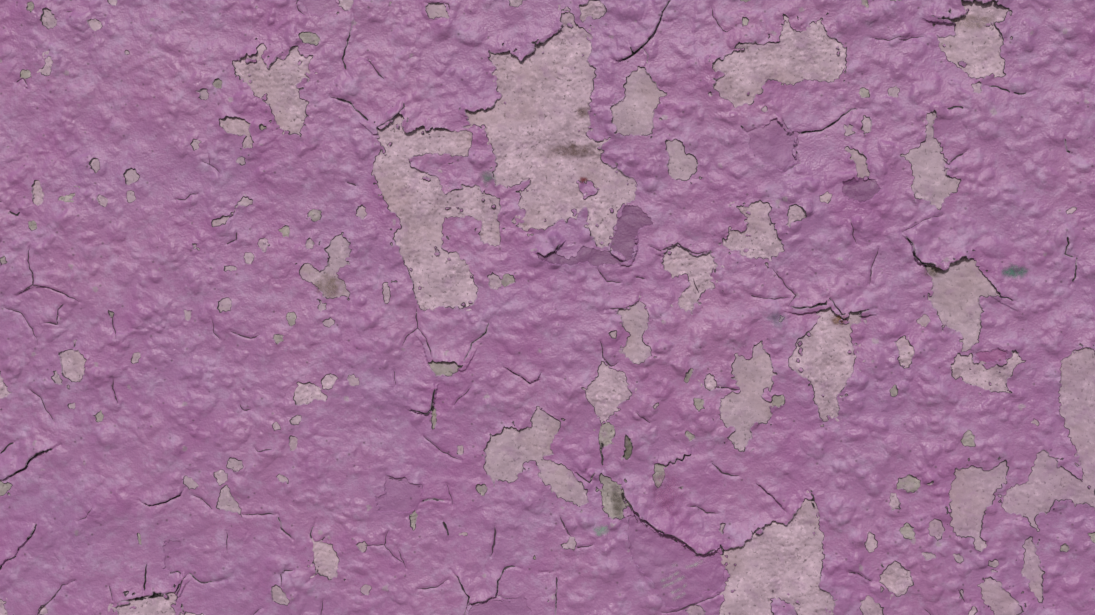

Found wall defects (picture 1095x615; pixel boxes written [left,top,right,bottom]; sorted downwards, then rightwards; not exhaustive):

peeling [219,32,320,165]
crack [612,0,669,60]
peeling [709,15,846,171]
peeling [921,0,1012,93]
peeling [359,0,666,376]
peeling [652,201,806,313]
peeling [779,266,877,426]
crack [0,519,37,568]
crack [0,391,54,481]
peeling [108,541,203,615]
peeling [476,407,835,615]
peeling [928,344,1095,615]